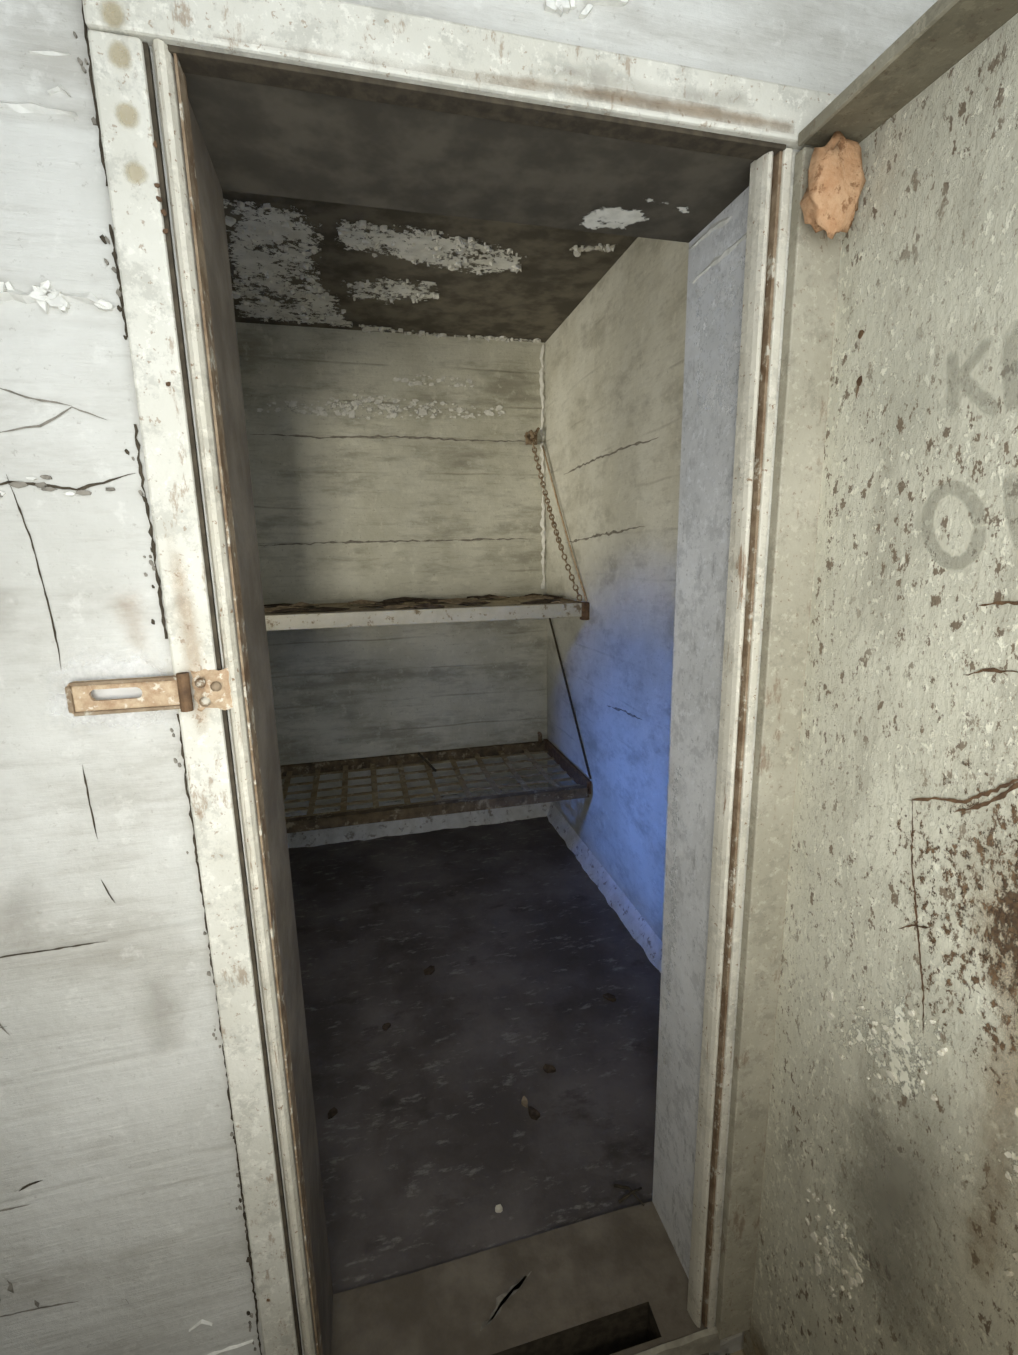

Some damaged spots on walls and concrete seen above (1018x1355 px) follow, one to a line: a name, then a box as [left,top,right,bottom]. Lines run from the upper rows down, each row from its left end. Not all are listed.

peeling [223,199,541,343]
peeling [569,198,689,257]
crack [0,388,168,667]
crack [82,765,98,839]